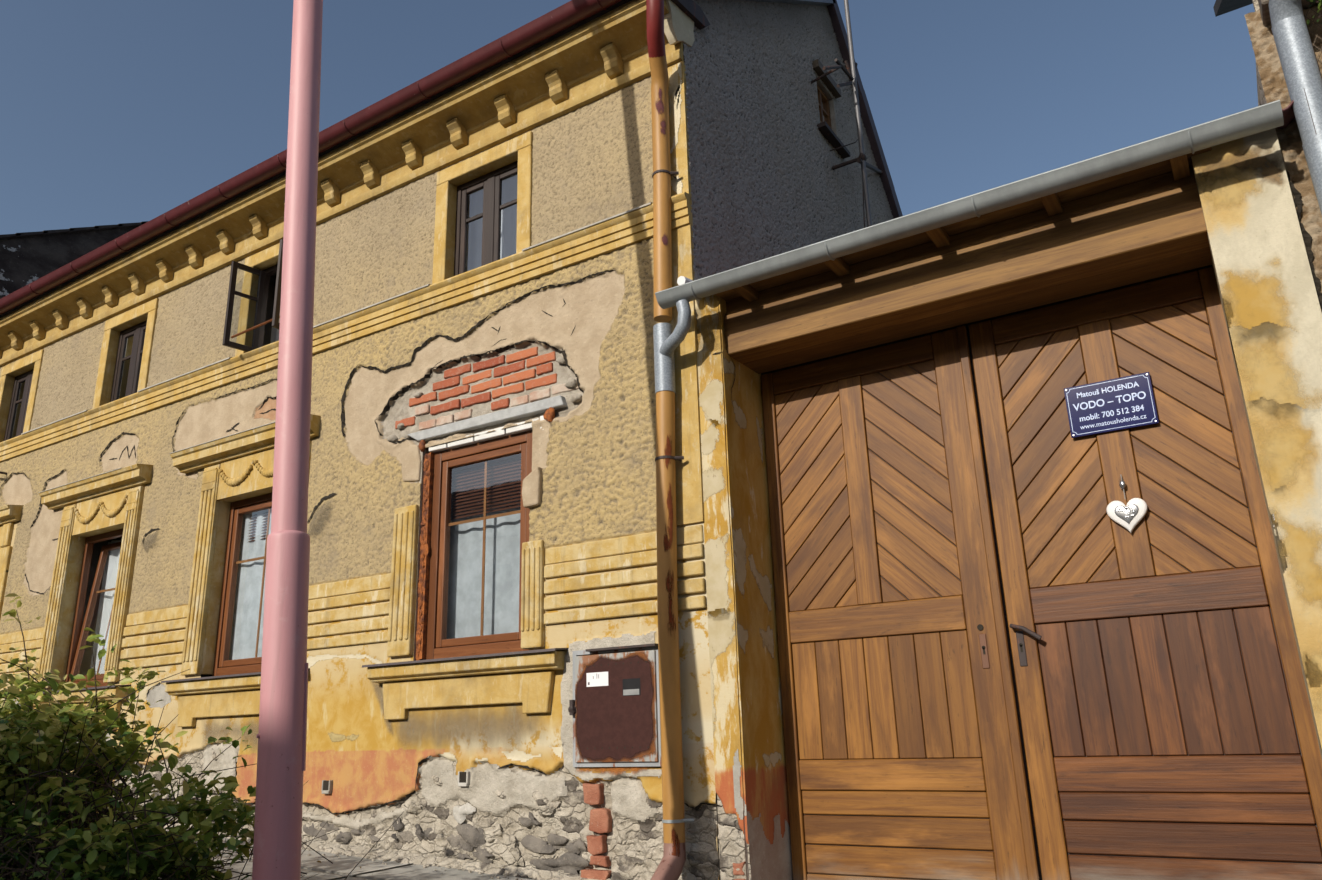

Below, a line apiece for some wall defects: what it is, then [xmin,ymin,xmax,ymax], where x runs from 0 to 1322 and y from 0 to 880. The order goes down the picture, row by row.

flaking render [0,269,38,296]
flaking render [99,432,139,472]
flaking render [172,379,277,452]
flaking render [341,269,625,508]
peeling [699,354,763,503]
flaking render [0,470,68,596]
peeling [704,507,774,736]
peeling [475,631,662,880]